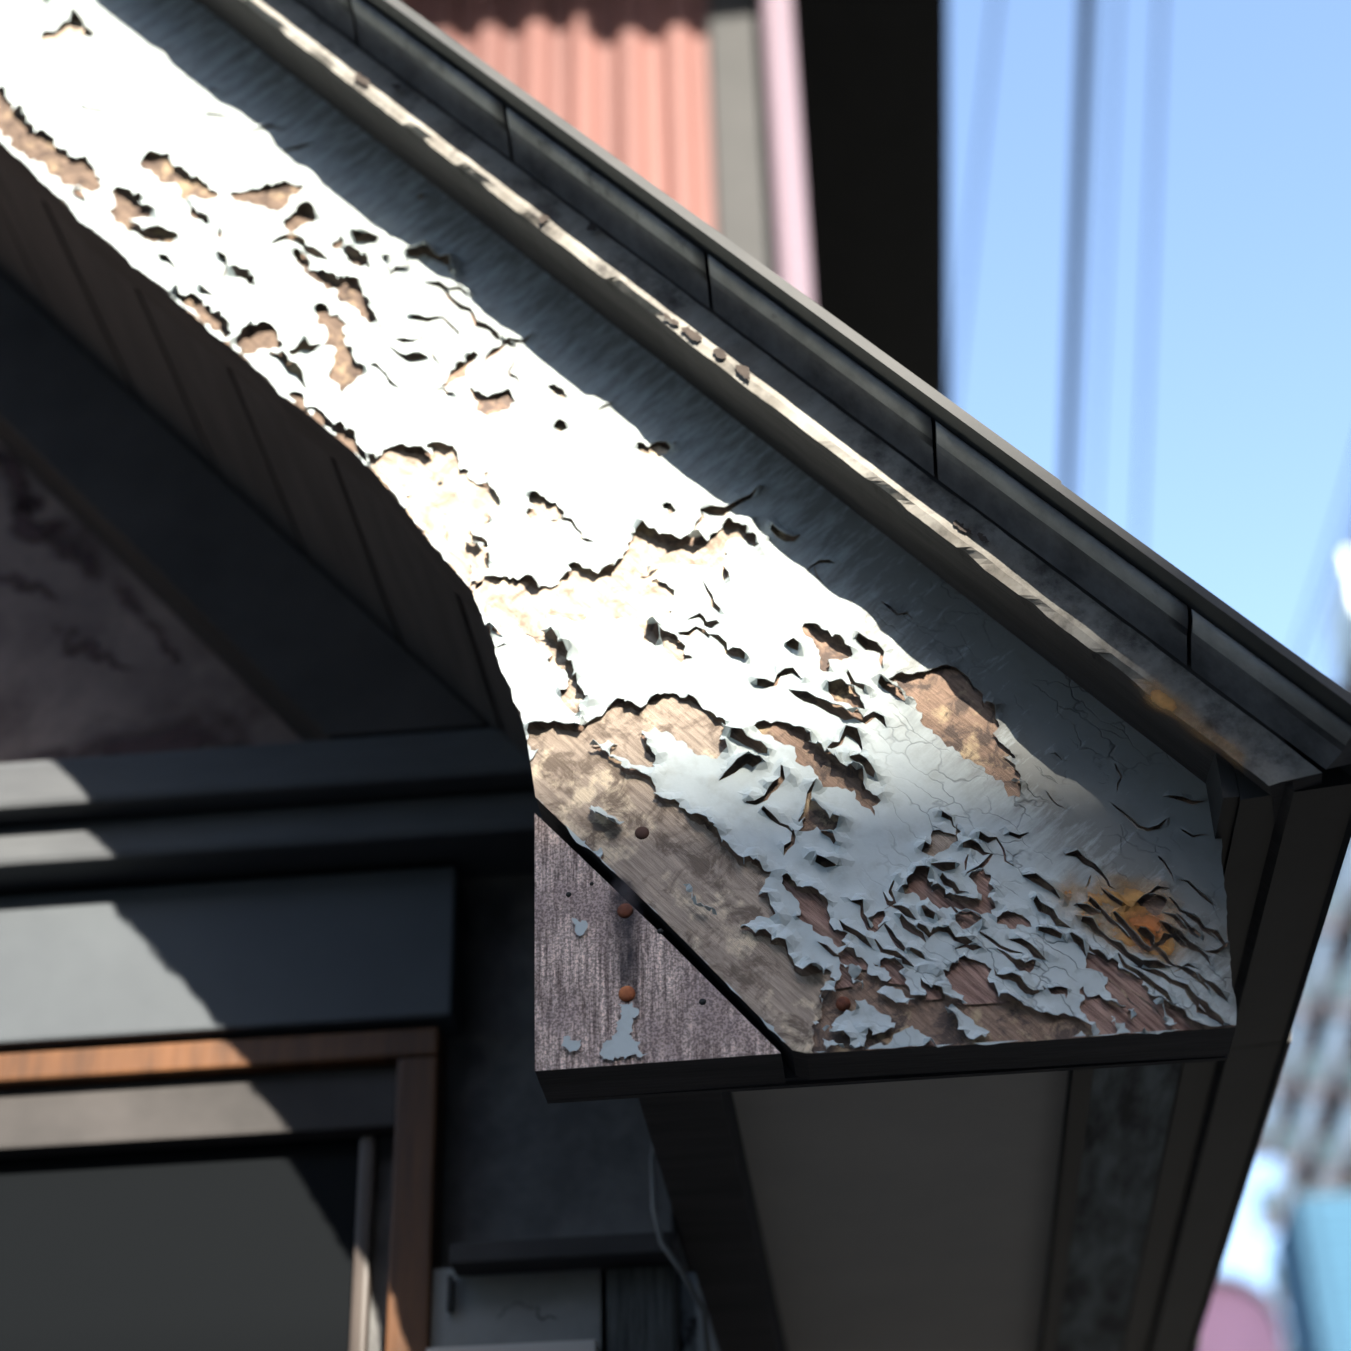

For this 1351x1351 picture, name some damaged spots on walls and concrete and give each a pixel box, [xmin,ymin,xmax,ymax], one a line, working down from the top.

peeling [0,75,1236,1061]